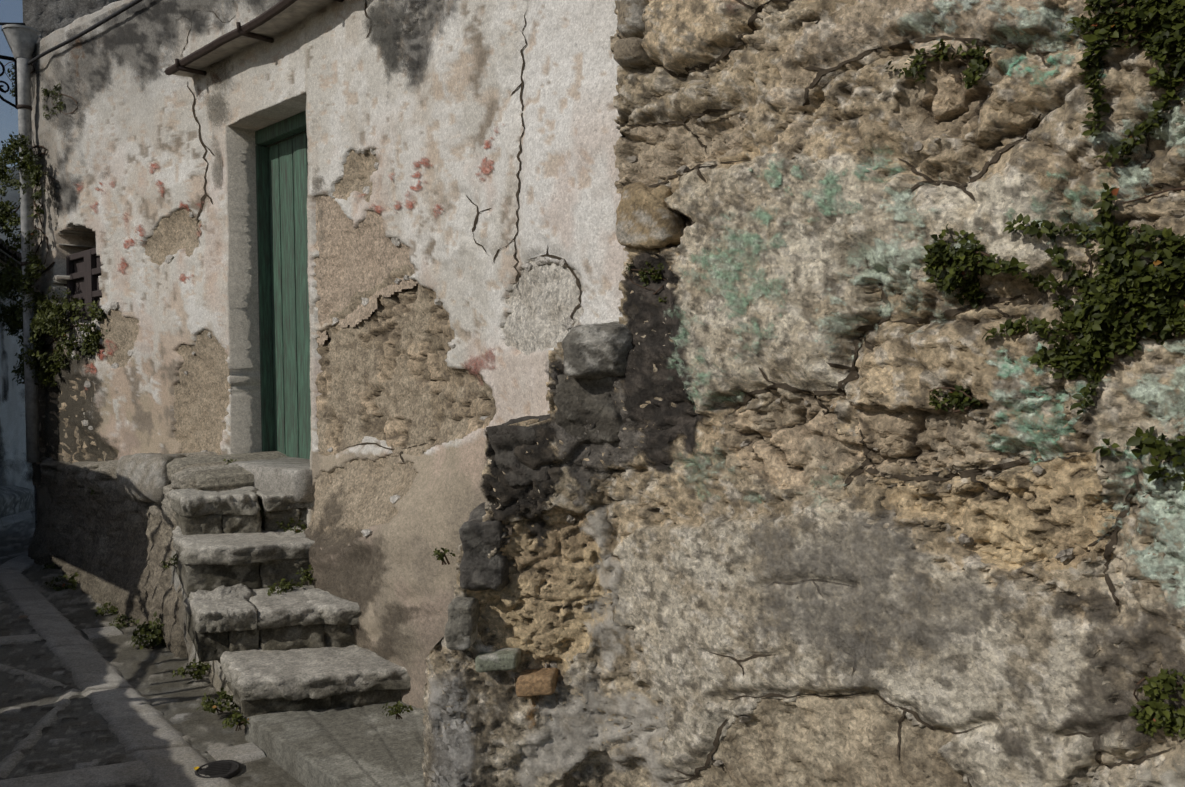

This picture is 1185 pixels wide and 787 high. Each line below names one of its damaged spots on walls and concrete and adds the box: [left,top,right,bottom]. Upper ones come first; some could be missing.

water stain [35,0,281,215]
flaking render [118,201,202,274]
flaking render [174,329,231,455]
crack [181,10,237,241]
flaking render [308,148,497,548]
water stain [366,0,455,85]
peeling [476,131,498,180]
crack [466,3,581,333]
flaking render [502,256,585,356]
crack [672,635,992,784]